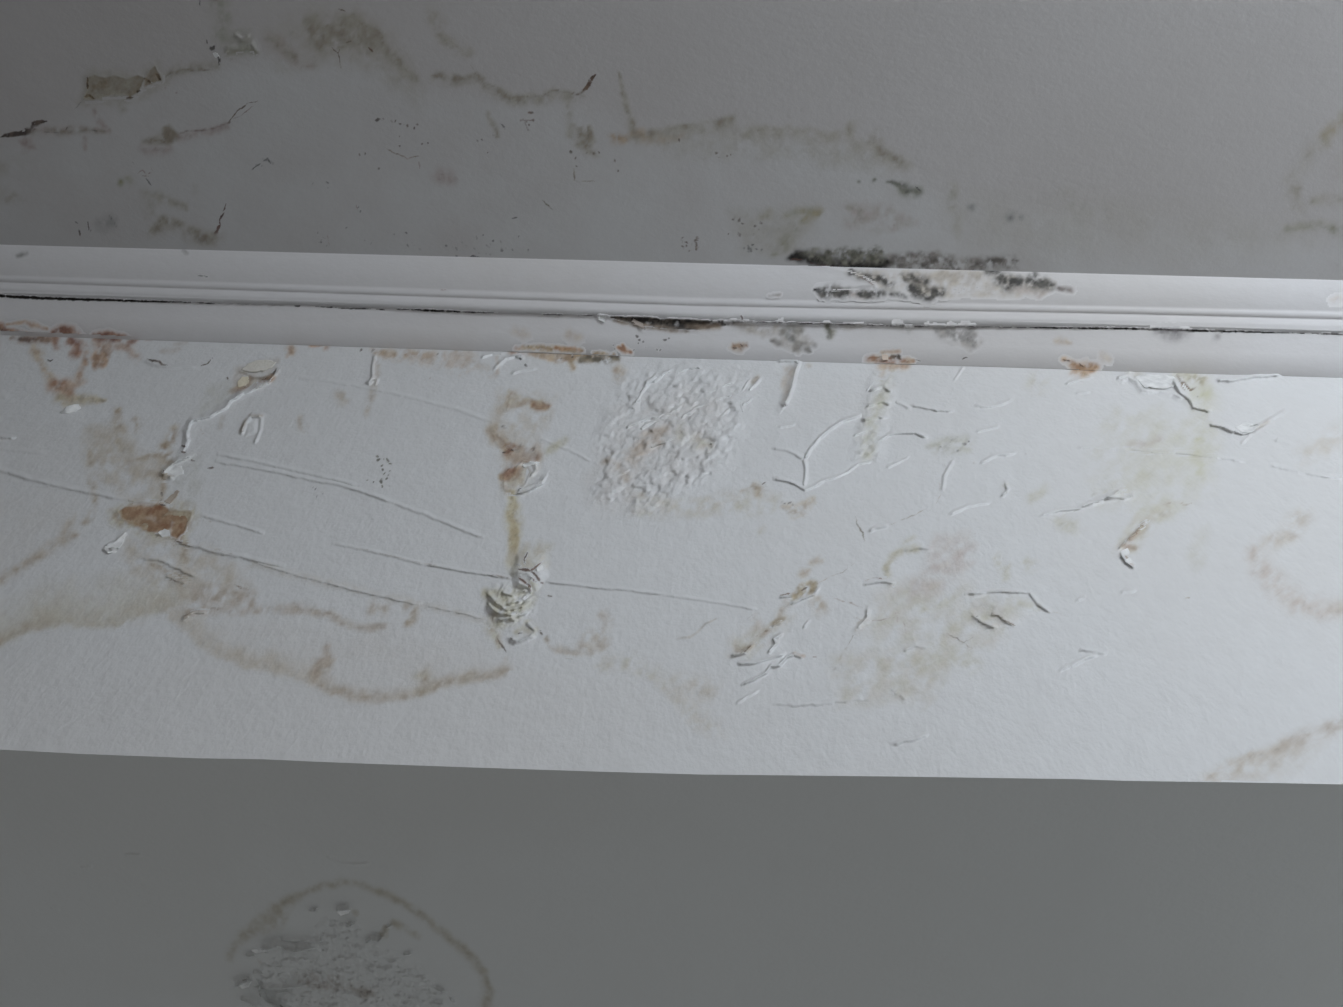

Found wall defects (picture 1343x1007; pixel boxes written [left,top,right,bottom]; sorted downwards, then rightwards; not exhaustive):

peeling [74,57,173,118]
crack [0,55,258,250]
leakage [0,0,1343,357]
leakage [0,402,731,744]
leakage [623,478,819,538]
leakage [821,525,1043,714]
leakage [1239,503,1343,627]
leakage [1192,709,1343,782]